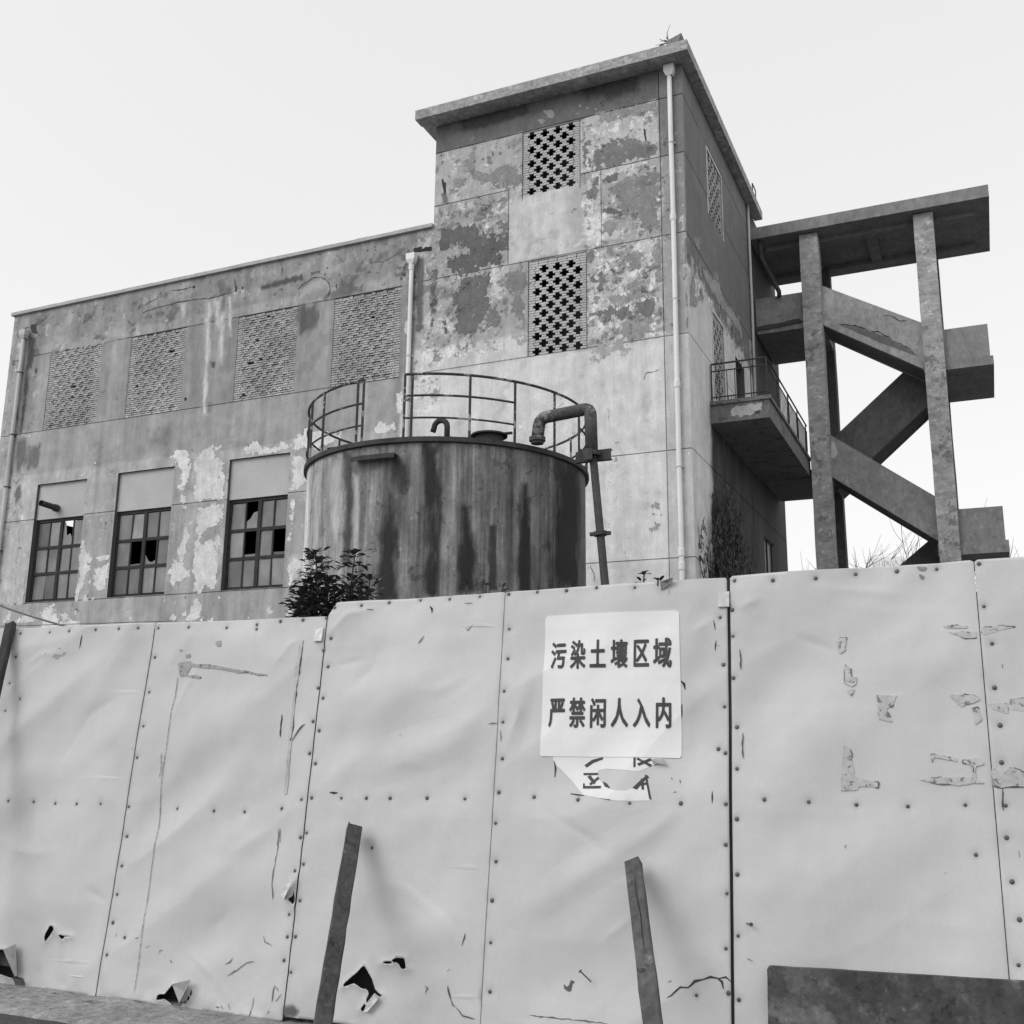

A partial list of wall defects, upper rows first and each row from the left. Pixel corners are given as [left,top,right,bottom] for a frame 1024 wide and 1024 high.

damp [203,296,232,414]
peeling [374,392,403,434]
peeling [1,527,110,627]
peeling [167,444,227,622]
peeling [244,428,342,541]
corrosion [312,453,360,562]
corrosion [377,456,406,600]
corrosion [422,444,441,596]
corrosion [458,508,497,592]
corrosion [518,484,531,591]
corrosion [556,463,579,587]
crack [667,976,731,998]